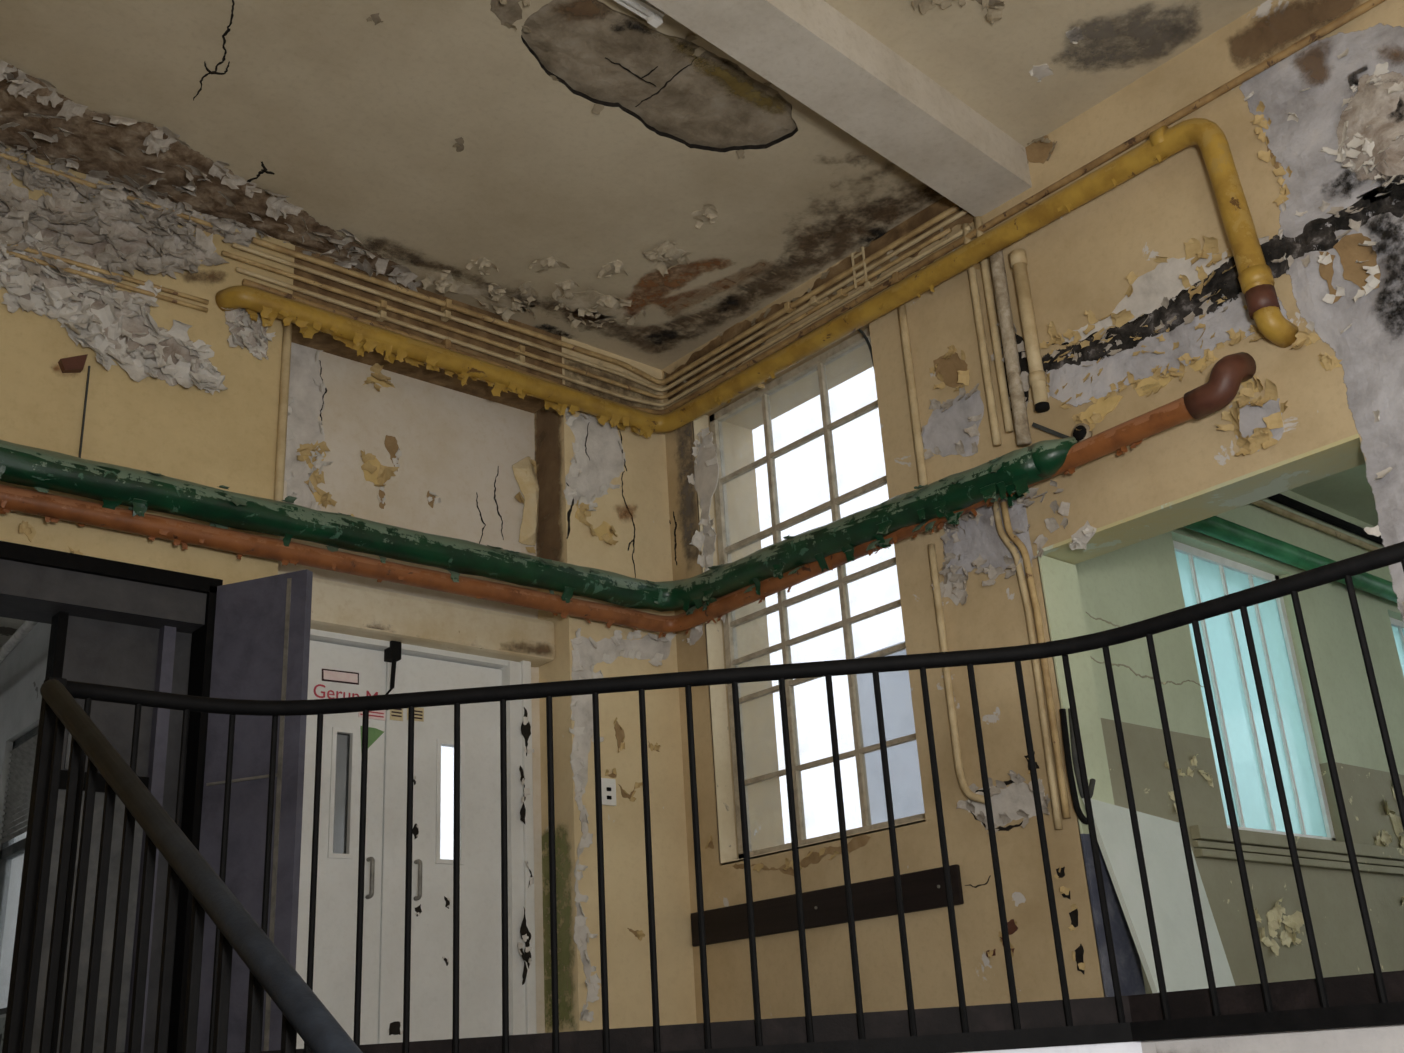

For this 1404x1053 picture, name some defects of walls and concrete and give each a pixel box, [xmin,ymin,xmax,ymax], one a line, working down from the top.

crack [193,0,235,101]
damp [1062,5,1196,69]
mould [1391,98,1404,121]
spalling [0,60,654,545]
damp [367,239,462,277]
damp [510,187,940,409]
spalling [990,236,1265,431]
spalling [1240,23,1404,547]
mould [1332,170,1404,335]
spalling [739,345,1097,606]
peeling [549,415,726,1022]
peeling [956,751,1051,834]